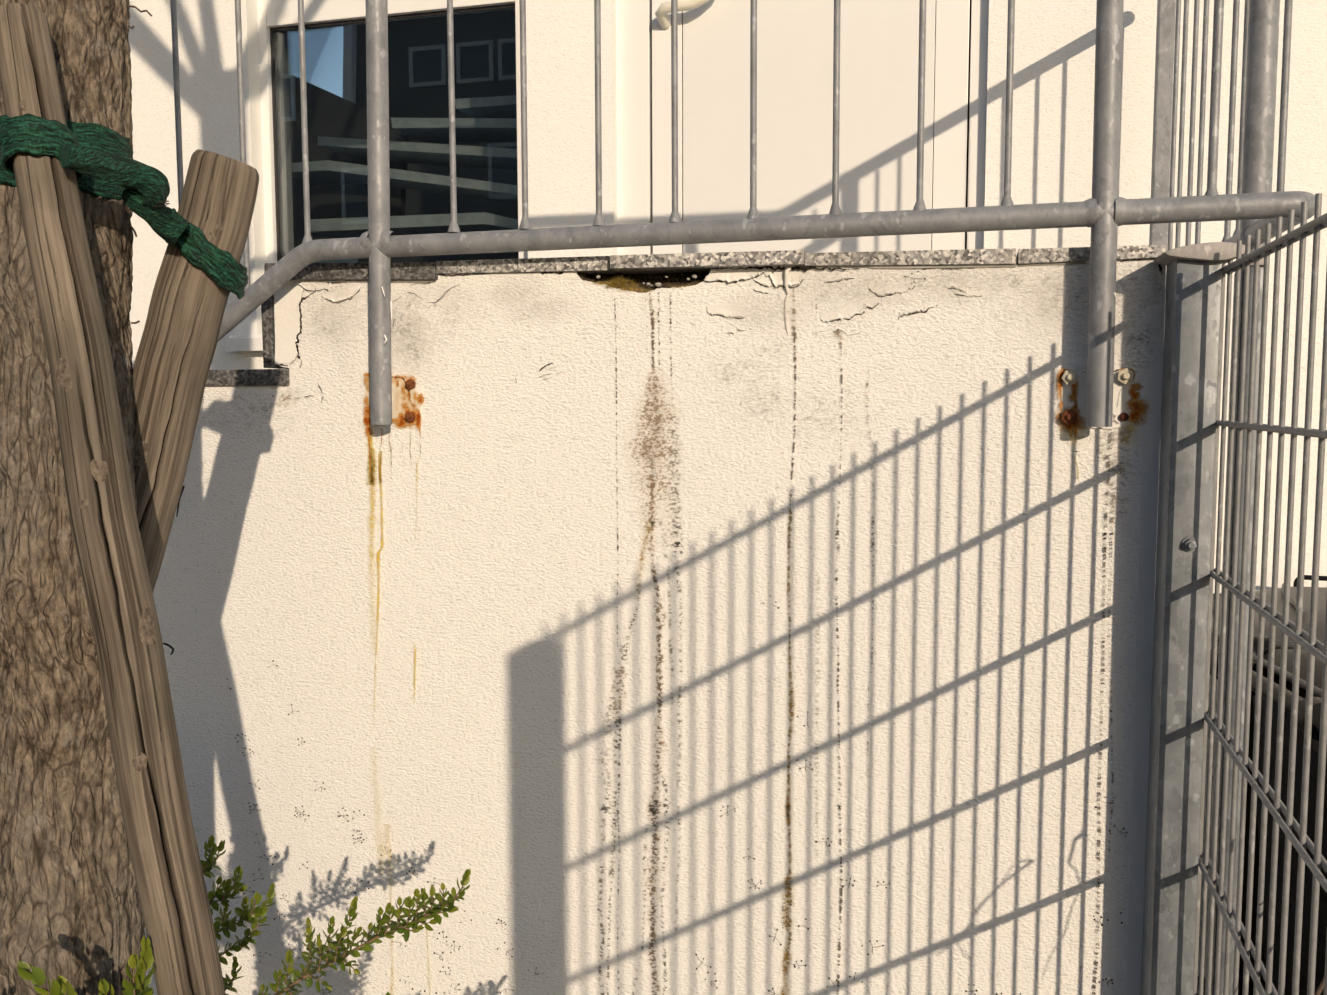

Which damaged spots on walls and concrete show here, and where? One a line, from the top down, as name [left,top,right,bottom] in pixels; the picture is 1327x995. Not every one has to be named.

crack [275,282,343,403]
spalling [577,270,804,294]
peeling [706,304,749,335]
peeling [813,277,916,336]
peeling [898,302,938,320]
rust [1056,369,1083,479]
rust [1113,369,1148,439]
rust [363,373,424,668]
damp [633,292,682,995]
damp [781,267,797,995]
damp [598,528,639,995]
damp [1093,635,1114,995]